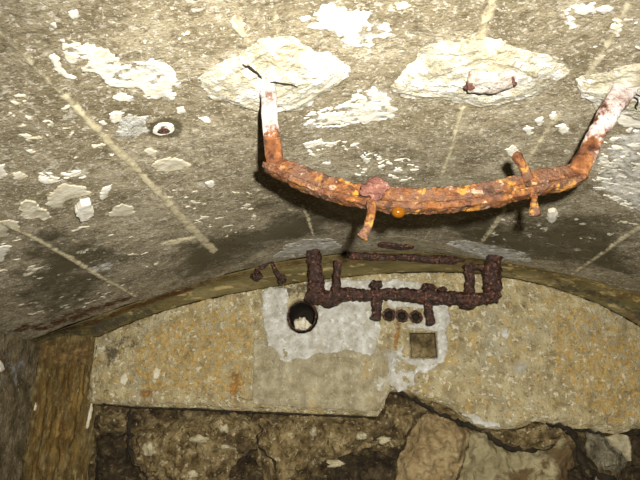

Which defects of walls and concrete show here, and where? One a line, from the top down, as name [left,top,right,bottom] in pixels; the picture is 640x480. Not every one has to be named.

peeling [300,2,393,48]
peeling [48,39,181,103]
peeling [303,87,398,128]
peeling [0,170,94,273]
peeling [100,184,113,201]
peeling [108,204,135,217]
peeling [22,265,51,280]